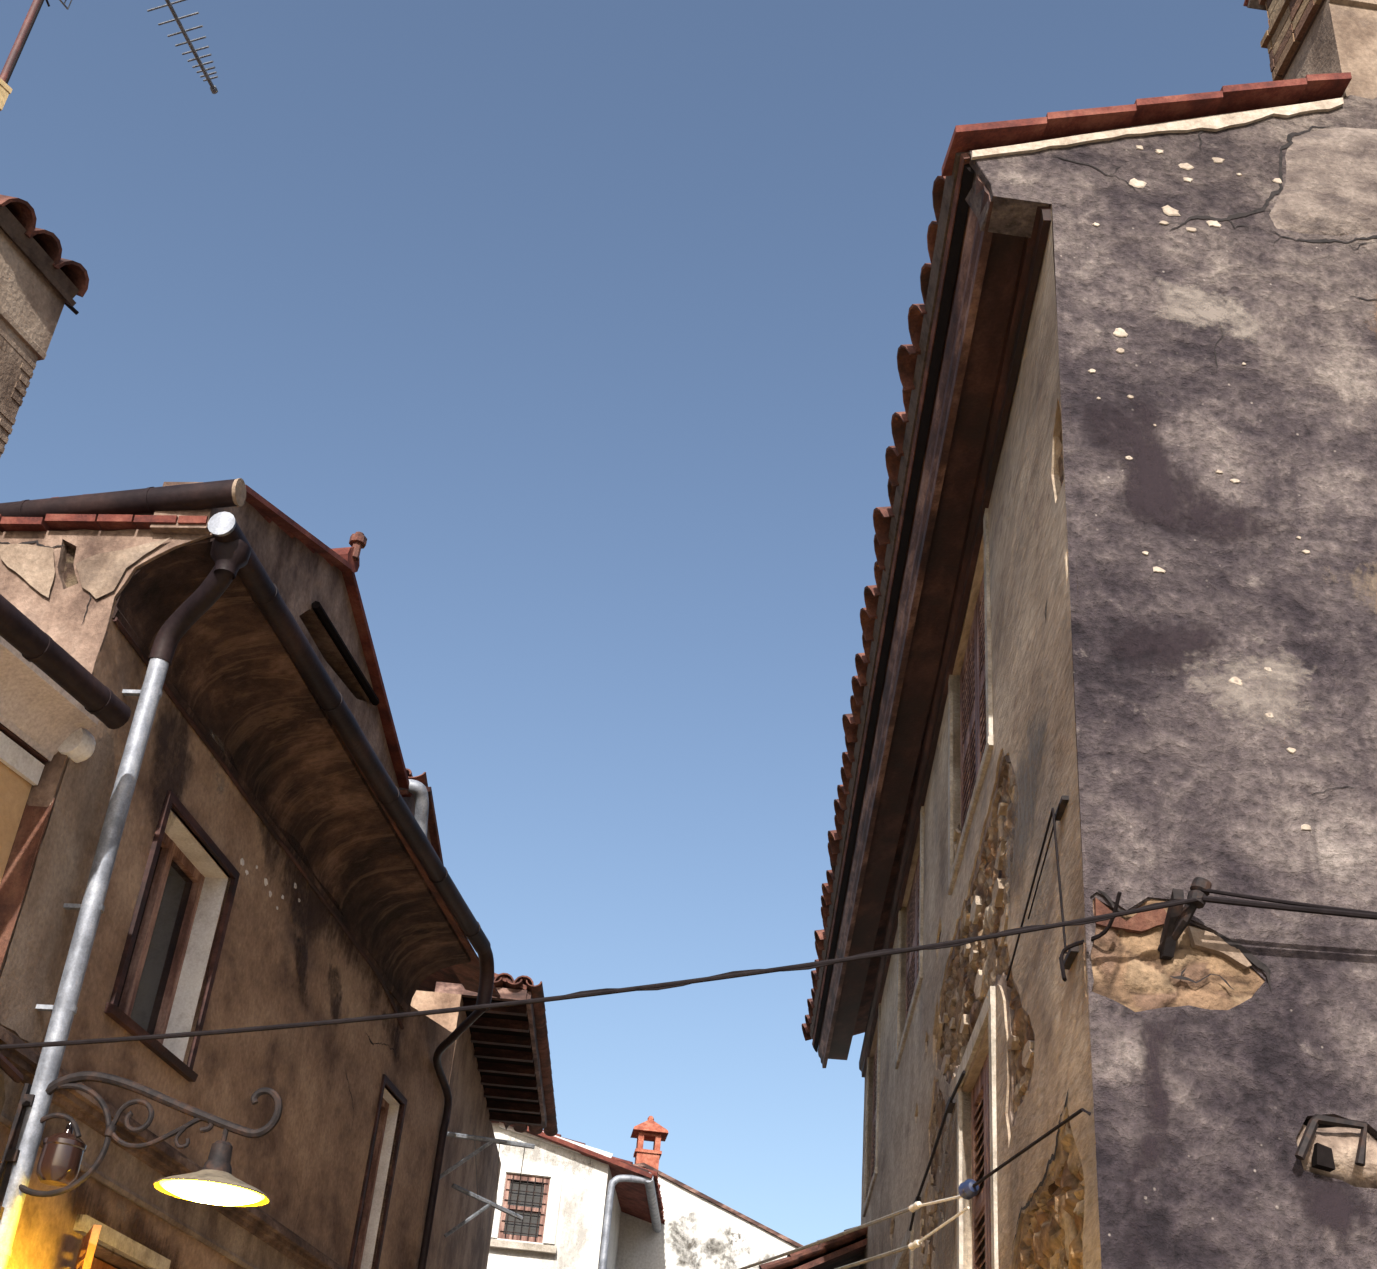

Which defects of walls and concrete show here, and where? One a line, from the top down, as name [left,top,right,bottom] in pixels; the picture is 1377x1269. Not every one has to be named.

crack [1053,155,1138,192]
crack [1171,125,1377,250]
damp [1168,289,1258,337]
damp [1092,403,1275,538]
crack [0,540,64,548]
damp [1229,661,1295,720]
spalling [918,751,1035,1269]
spalling [1083,889,1272,1014]
spalling [1011,1106,1085,1269]